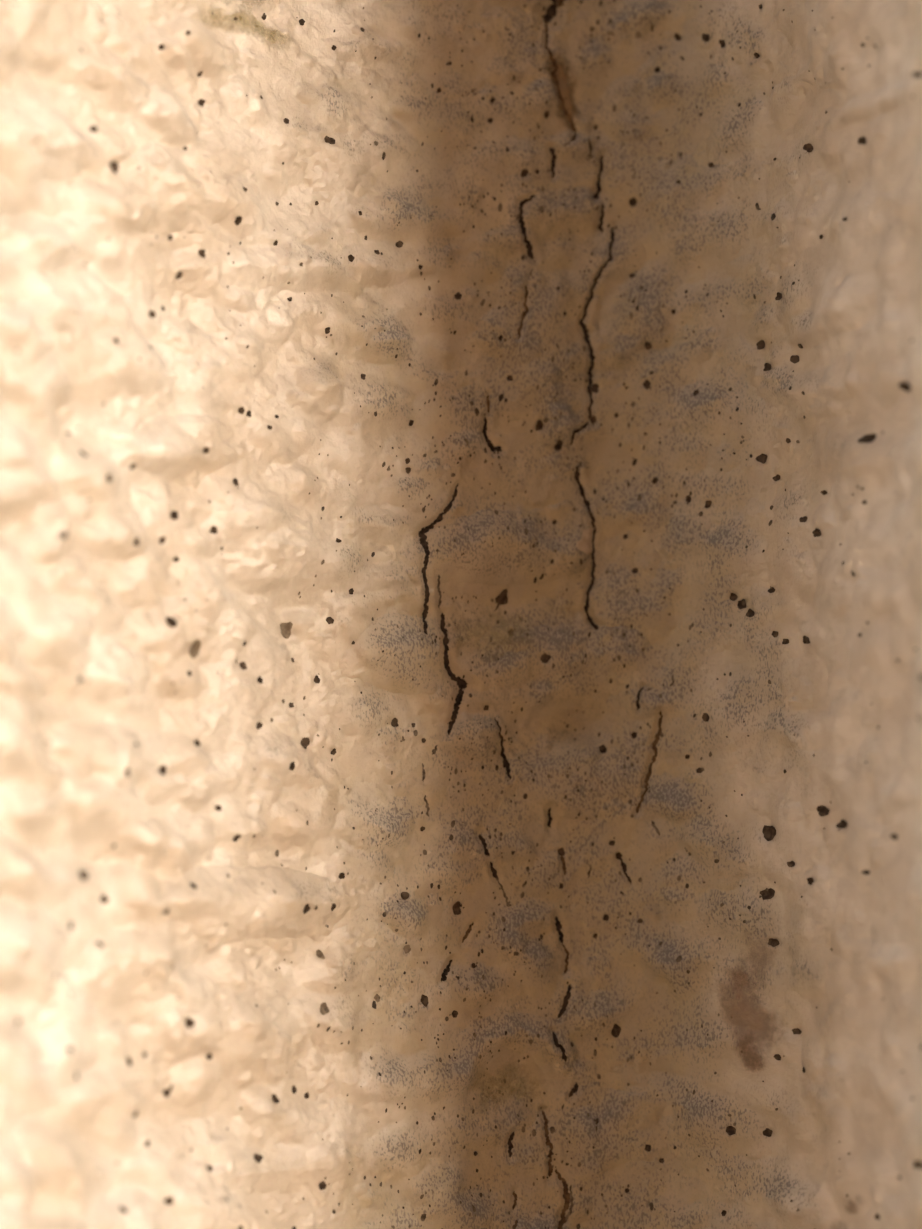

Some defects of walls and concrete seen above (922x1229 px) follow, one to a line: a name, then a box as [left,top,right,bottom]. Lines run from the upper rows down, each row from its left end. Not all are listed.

crack [516,0,615,630]
crack [482,395,502,452]
crack [418,483,468,816]
crack [494,718,511,779]
crack [636,674,674,836]
crack [545,808,553,828]
crack [478,834,509,907]
crack [561,855,631,883]
crack [441,922,474,982]
crack [542,916,578,1229]
crack [507,1132,515,1158]
crack [510,1191,518,1229]